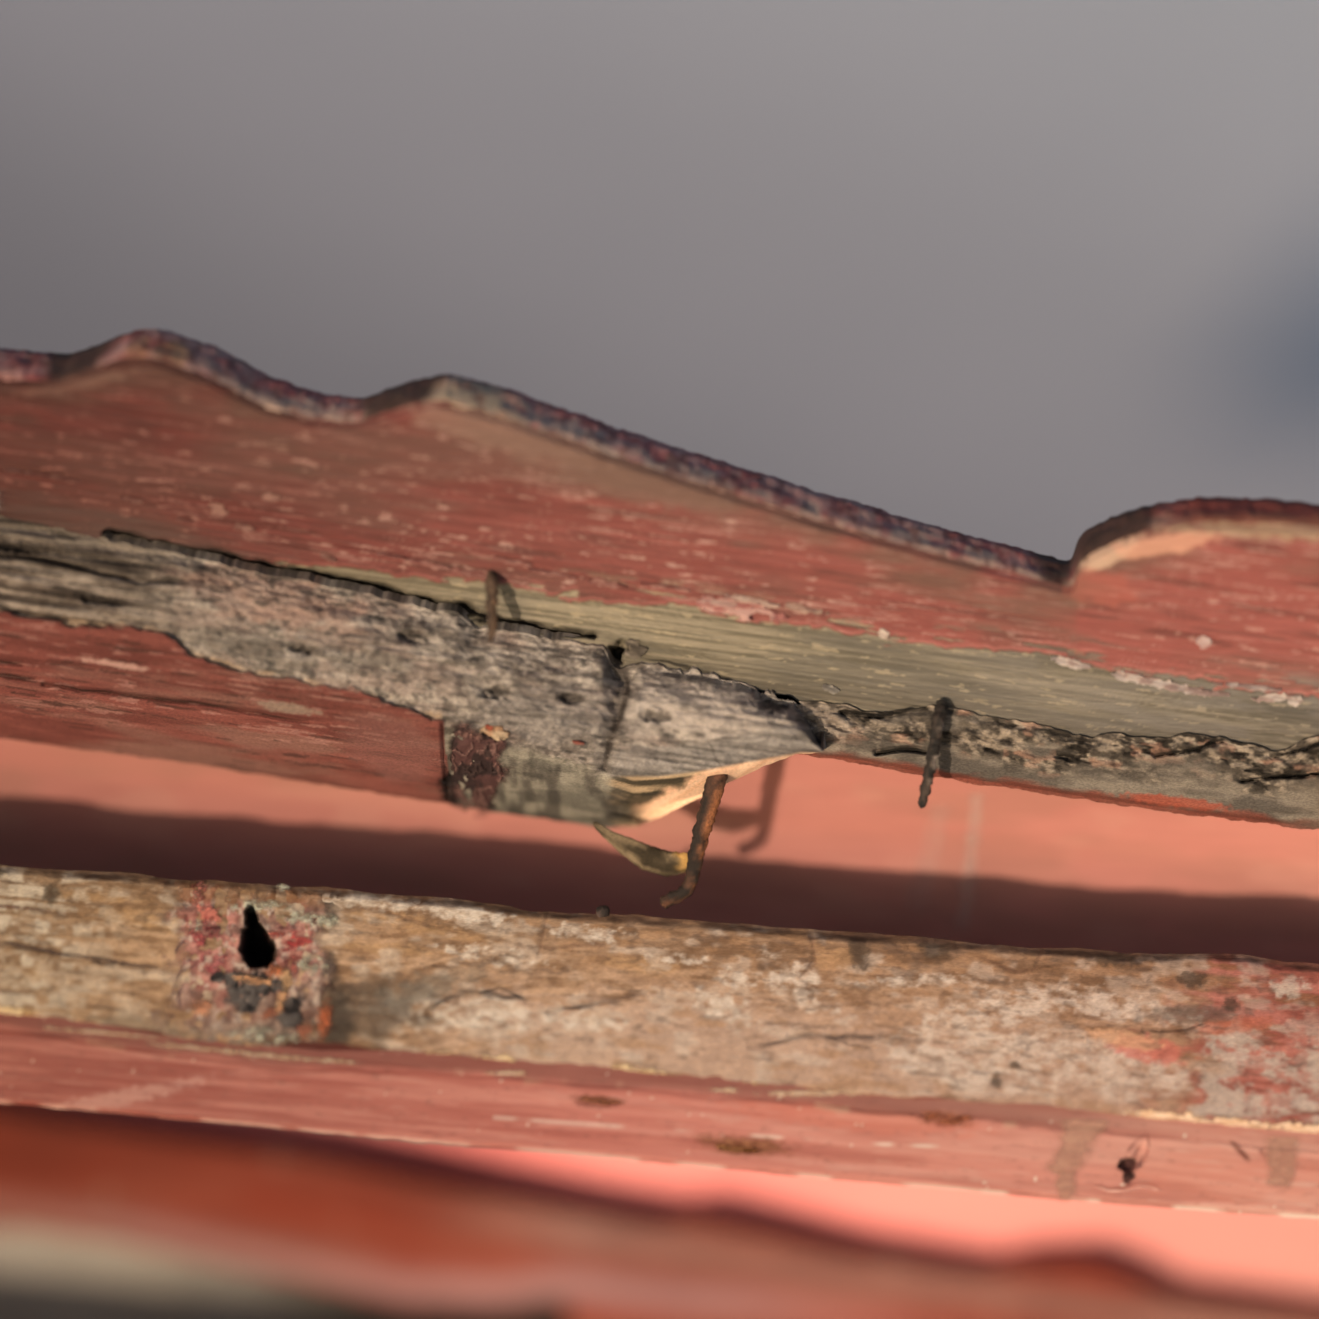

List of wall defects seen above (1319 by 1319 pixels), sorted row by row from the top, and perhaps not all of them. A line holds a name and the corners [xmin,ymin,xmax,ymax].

peeling [209,503,256,532]
peeling [369,552,829,622]
peeling [1196,635,1211,649]
crack [655,660,731,680]
peeling [1051,655,1091,670]
peeling [1111,670,1303,707]
crack [606,684,629,754]
peeling [480,725,509,741]
spalling [48,881,353,1064]
spalling [0,1006,33,1016]
spalling [474,1054,525,1075]
spalling [711,1082,863,1097]